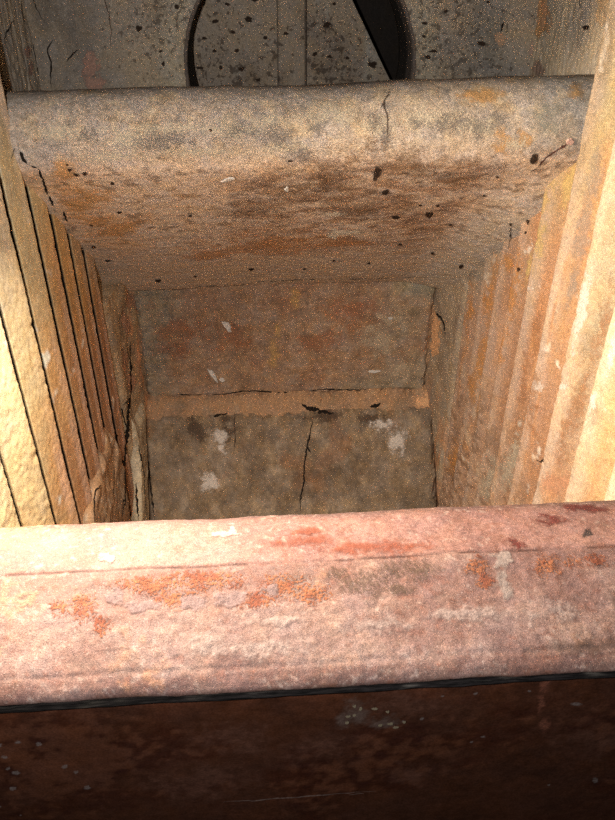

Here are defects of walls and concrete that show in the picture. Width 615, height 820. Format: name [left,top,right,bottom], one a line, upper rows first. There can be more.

crack [5,0,77,84]
crack [381,89,390,141]
efflorescence [215,429,229,454]
crack [177,388,394,512]
efflorescence [370,419,411,455]
efflorescence [200,473,220,490]
corrosion [564,504,608,513]
corrosion [106,567,333,610]
corrosion [335,542,413,553]
corrosion [464,552,495,589]
corrosion [534,552,609,577]
corrosion [48,590,114,638]